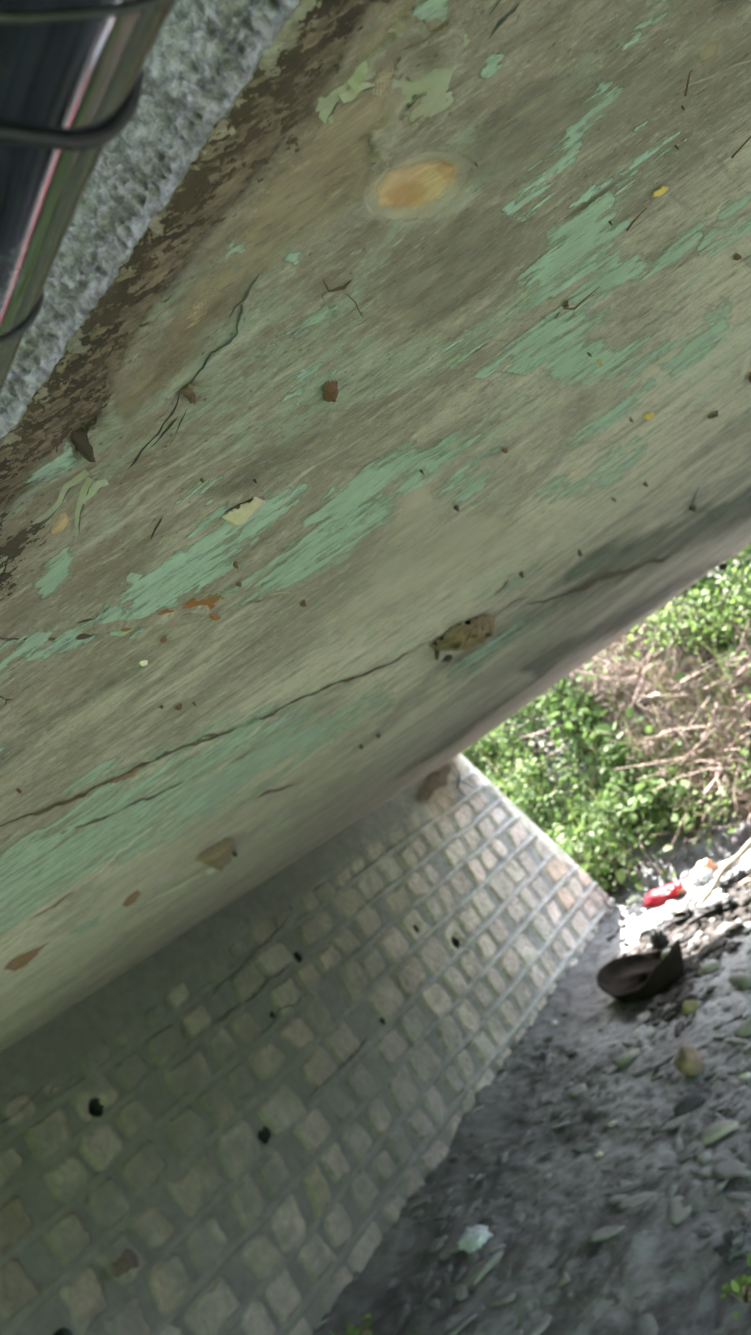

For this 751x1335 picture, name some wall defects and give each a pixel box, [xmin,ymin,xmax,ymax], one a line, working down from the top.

peeling [368,0,470,172]
spalling [0,0,299,442]
water stain [0,0,398,601]
peeling [473,131,751,448]
peeling [26,415,98,483]
crack [0,605,211,641]
crack [0,274,262,580]
peeling [0,684,393,938]
crack [0,637,436,842]
peeling [0,429,485,671]
crack [451,761,473,796]
crack [493,549,684,618]